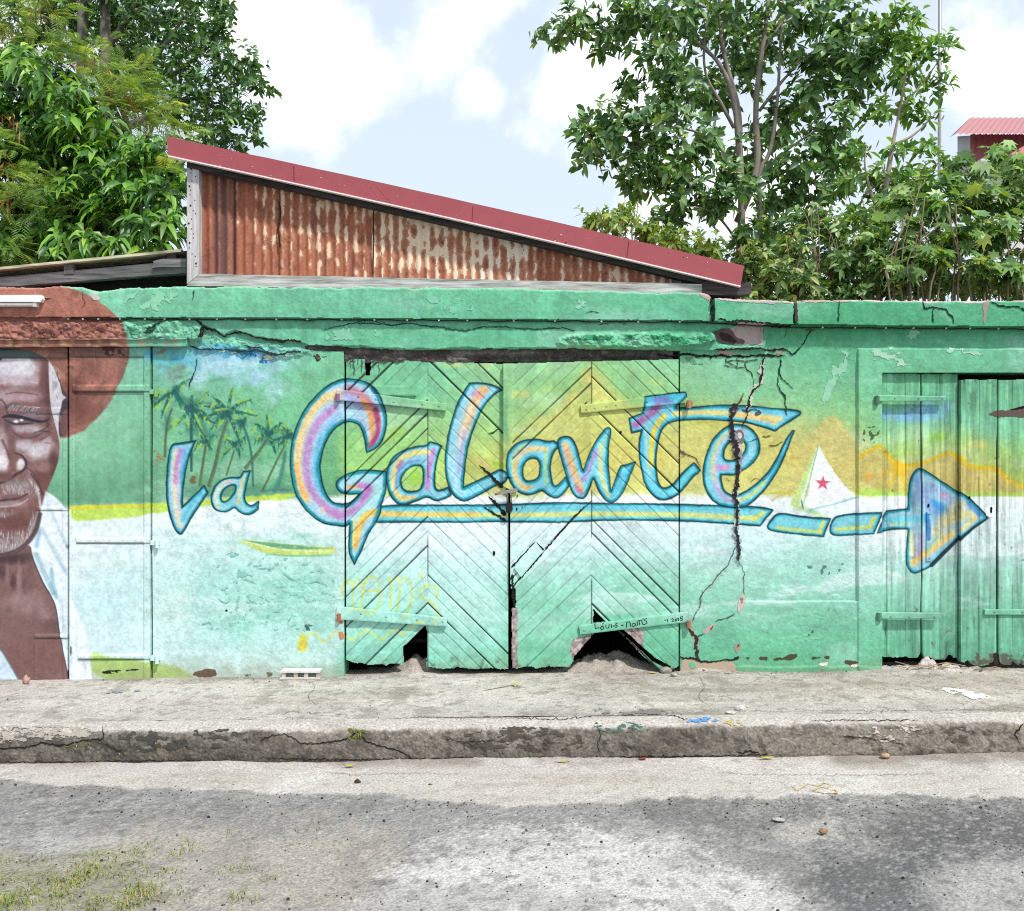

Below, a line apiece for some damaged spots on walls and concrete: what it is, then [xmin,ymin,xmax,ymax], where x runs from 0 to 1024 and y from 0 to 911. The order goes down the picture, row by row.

crack [324,311,625,332]
spalling [715,321,765,355]
crack [922,301,954,324]
crack [657,298,812,663]
crack [0,727,201,764]